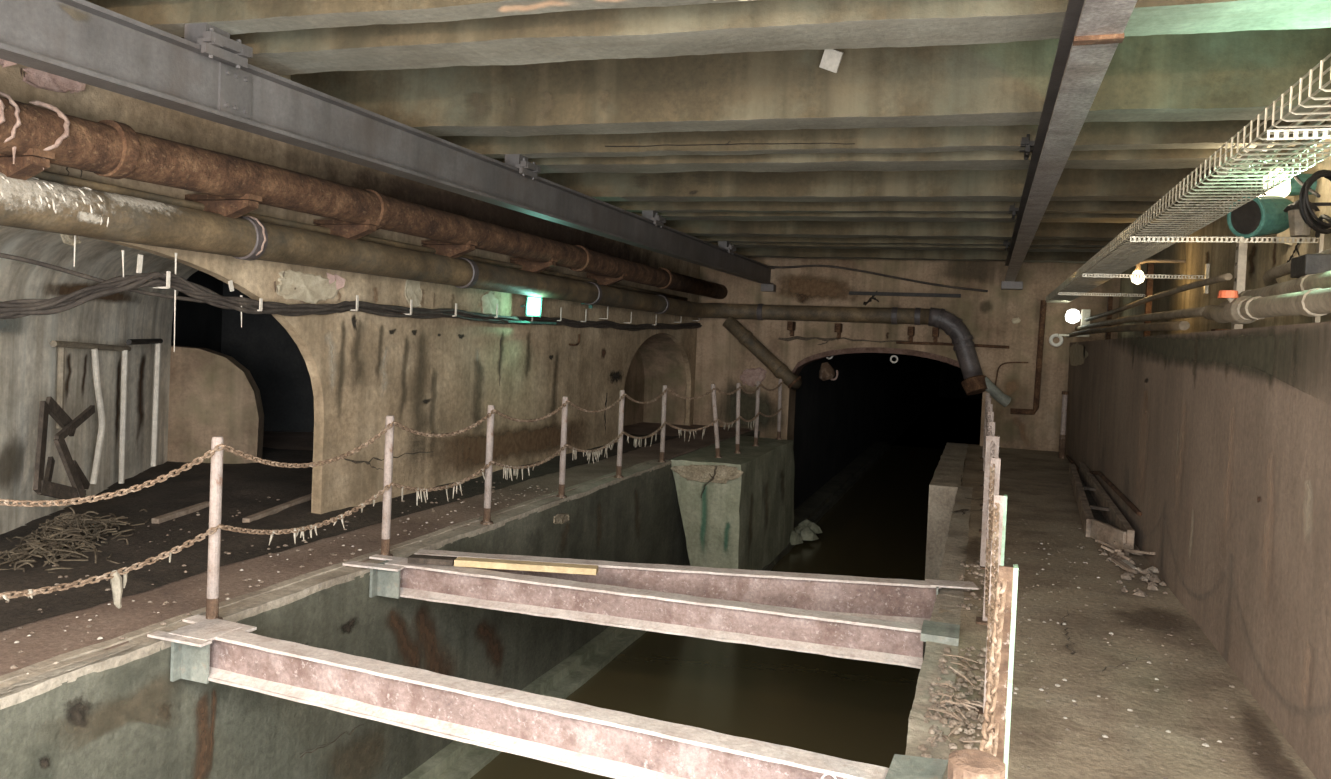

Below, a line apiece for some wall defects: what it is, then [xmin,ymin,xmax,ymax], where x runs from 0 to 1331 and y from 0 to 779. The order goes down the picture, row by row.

rust [501,2,561,11]
water stain [338,322,383,405]
water stain [401,337,582,470]
water stain [1119,330,1325,386]